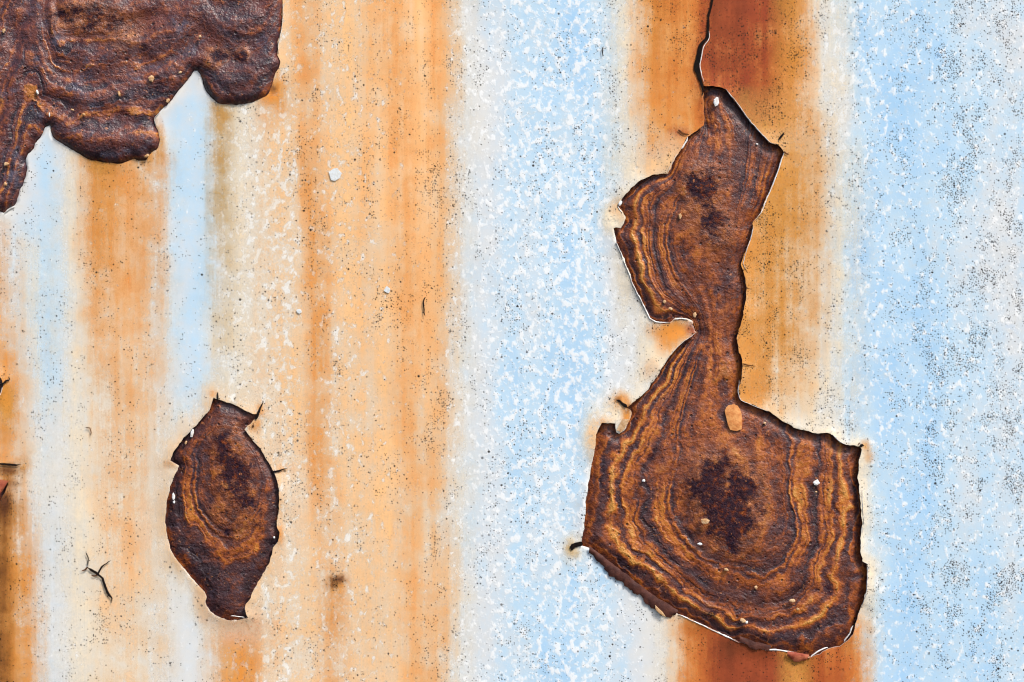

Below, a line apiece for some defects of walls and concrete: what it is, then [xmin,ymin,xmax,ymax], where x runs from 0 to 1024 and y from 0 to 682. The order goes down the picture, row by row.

peeling [0,0,283,213]
rust [603,193,626,232]
crack [694,0,713,95]
rust [0,275,37,682]
crack [82,553,112,603]
rust [65,138,183,682]
rust [194,586,207,615]
peeling [165,398,280,620]
rust [204,0,462,682]
rust [583,320,695,458]
peeling [582,86,868,662]
rust [615,0,876,682]